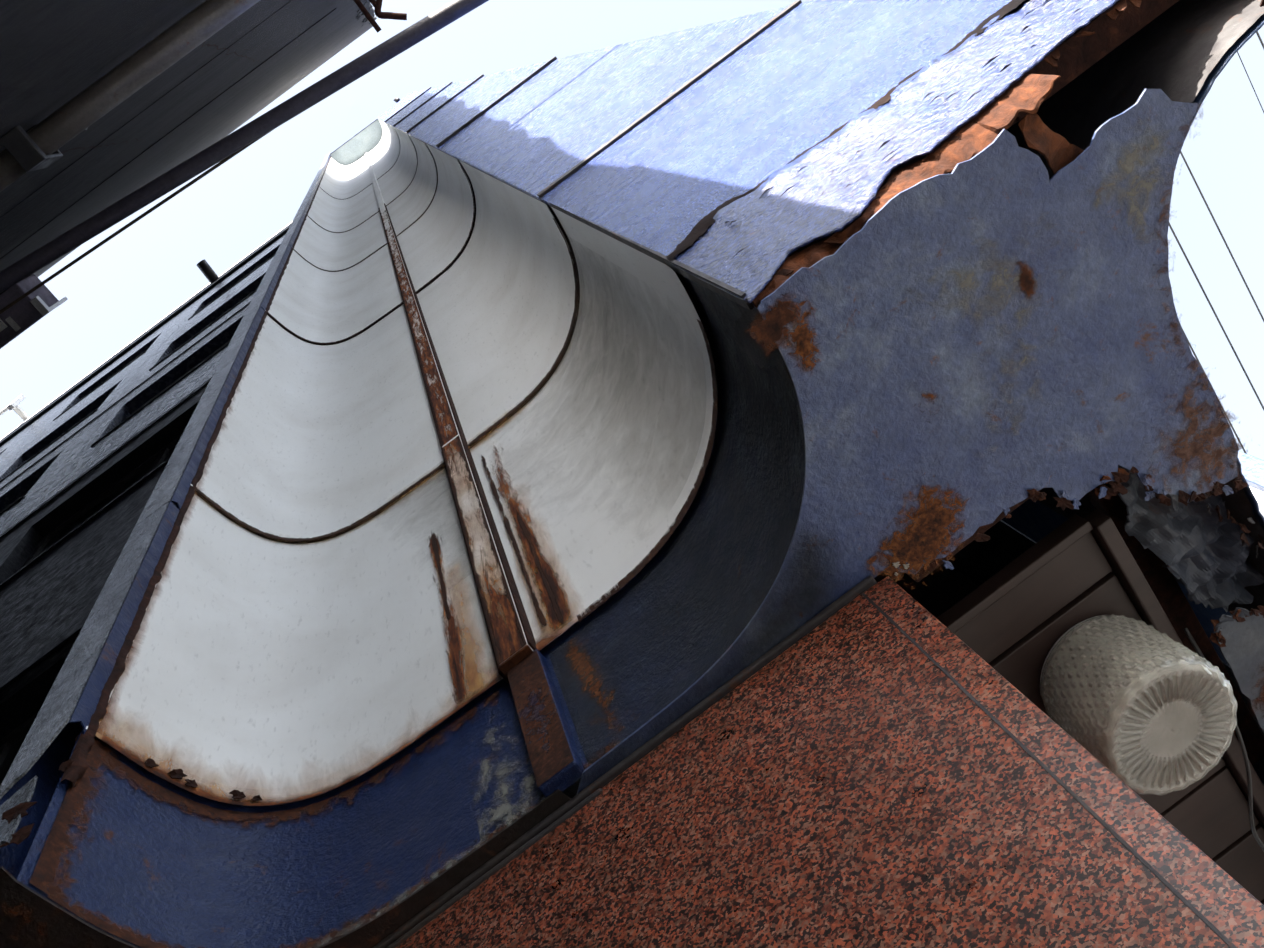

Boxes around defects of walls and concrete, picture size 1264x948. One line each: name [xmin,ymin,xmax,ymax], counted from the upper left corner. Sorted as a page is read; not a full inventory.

rust [1106,0,1142,20]
rust [746,49,1061,373]
rust [1157,168,1178,274]
rust [1094,306,1248,506]
rust [29,157,717,948]
rust [867,473,991,589]
rust [1027,488,1081,511]
rust [1209,605,1264,647]
peeling [474,726,536,841]